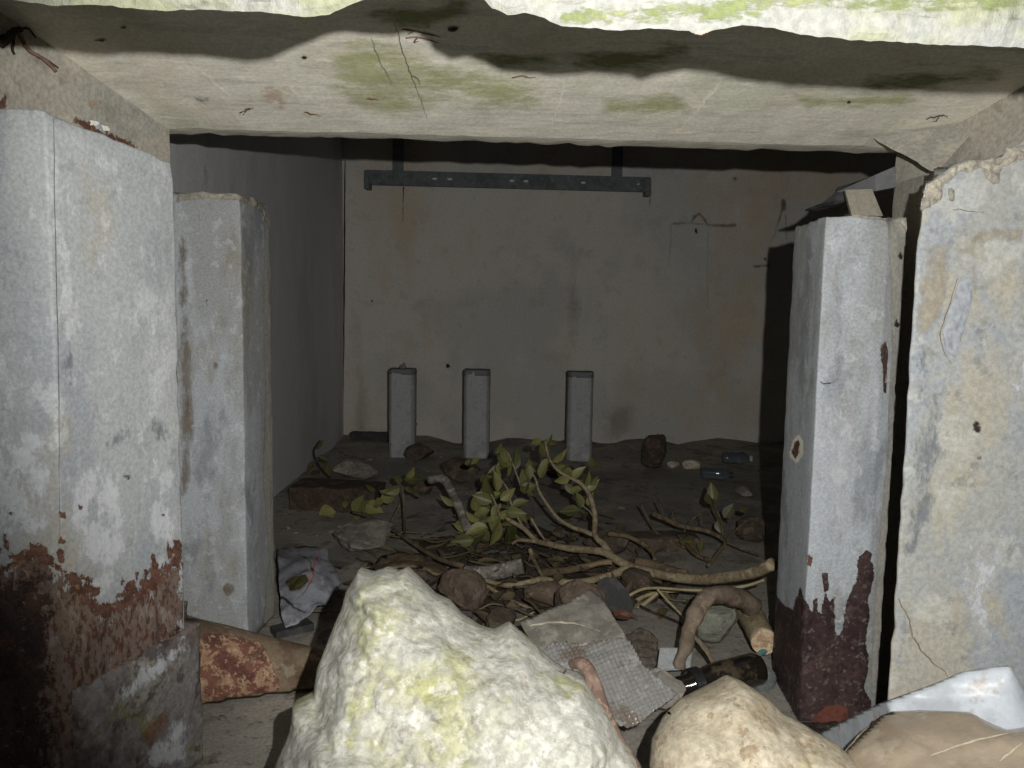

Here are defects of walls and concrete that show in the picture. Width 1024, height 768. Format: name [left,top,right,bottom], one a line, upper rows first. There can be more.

crack [371,25,427,117]
corrosion [74,117,138,148]
spalling [920,145,1024,211]
corrosion [880,342,888,393]
corrosion [0,527,183,768]
crack [898,598,948,677]